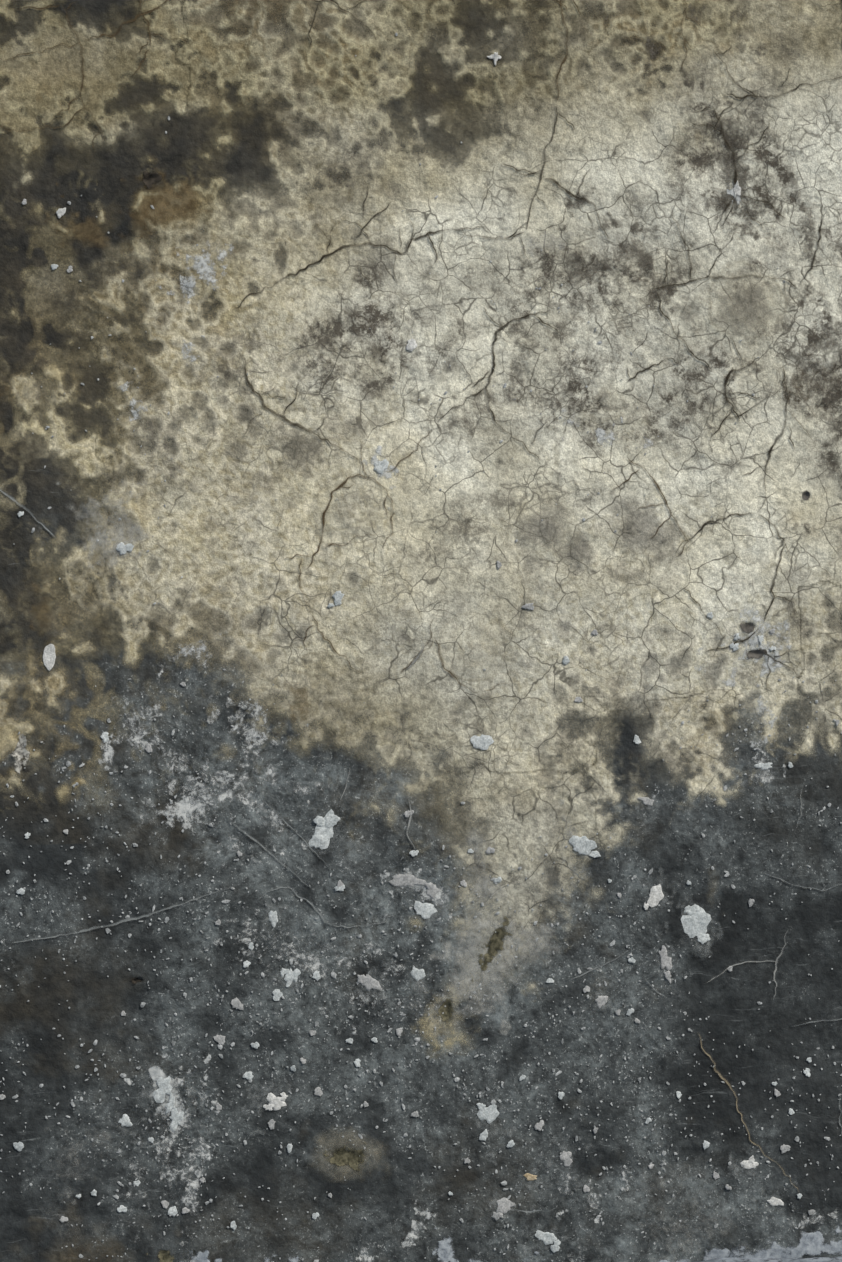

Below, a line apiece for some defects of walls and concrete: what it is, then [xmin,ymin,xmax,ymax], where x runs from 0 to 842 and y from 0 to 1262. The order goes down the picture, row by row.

crack [681,11,729,69]
crack [237,0,608,308]
crack [656,69,842,321]
crack [238,360,333,445]
crack [303,617,353,669]
water stain [0,0,842,1001]
crack [287,311,557,581]
crack [402,624,465,686]
crack [619,459,797,685]
crack [627,342,803,475]
water stain [149,1054,220,1208]
water stain [403,1203,436,1246]